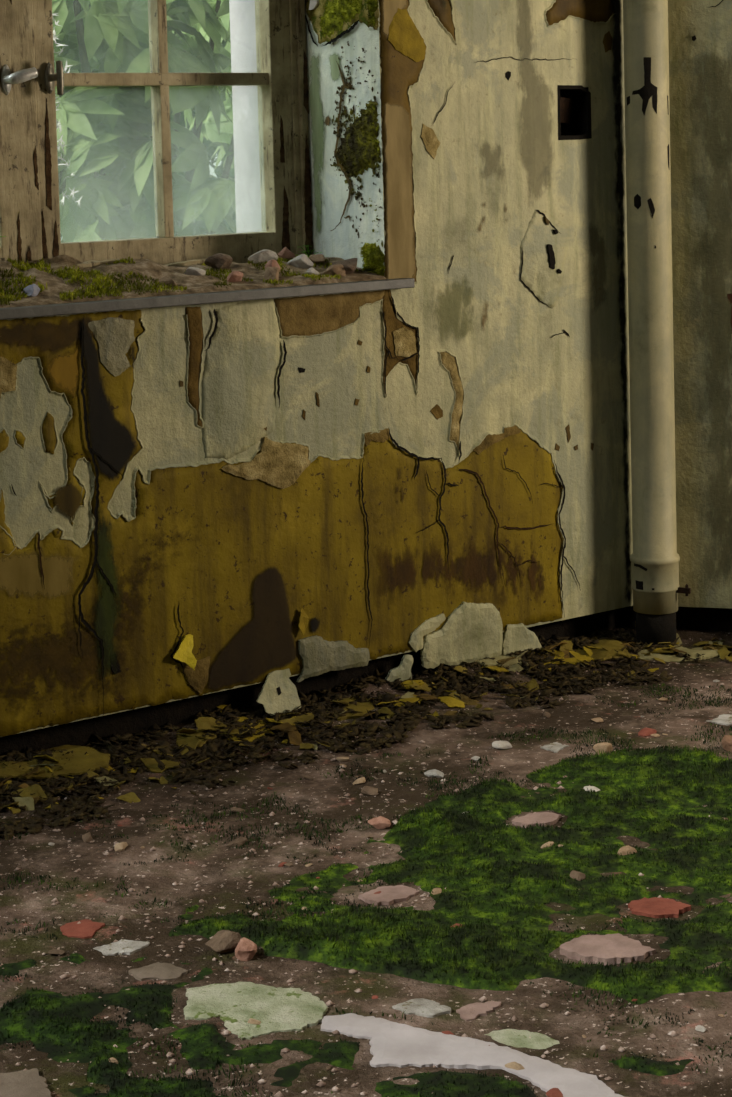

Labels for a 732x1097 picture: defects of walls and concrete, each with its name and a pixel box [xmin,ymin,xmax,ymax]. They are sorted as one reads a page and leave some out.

peeling [425,0,457,45]
peeling [543,0,616,53]
peeling [17,99,59,262]
leakage [309,41,378,232]
peeling [274,0,440,398]
spalling [544,217,562,274]
crack [382,291,420,397]
crack [37,533,45,589]
spalling [0,306,578,737]
crack [361,461,373,646]
crack [389,429,581,618]
flaking render [540,742,569,753]